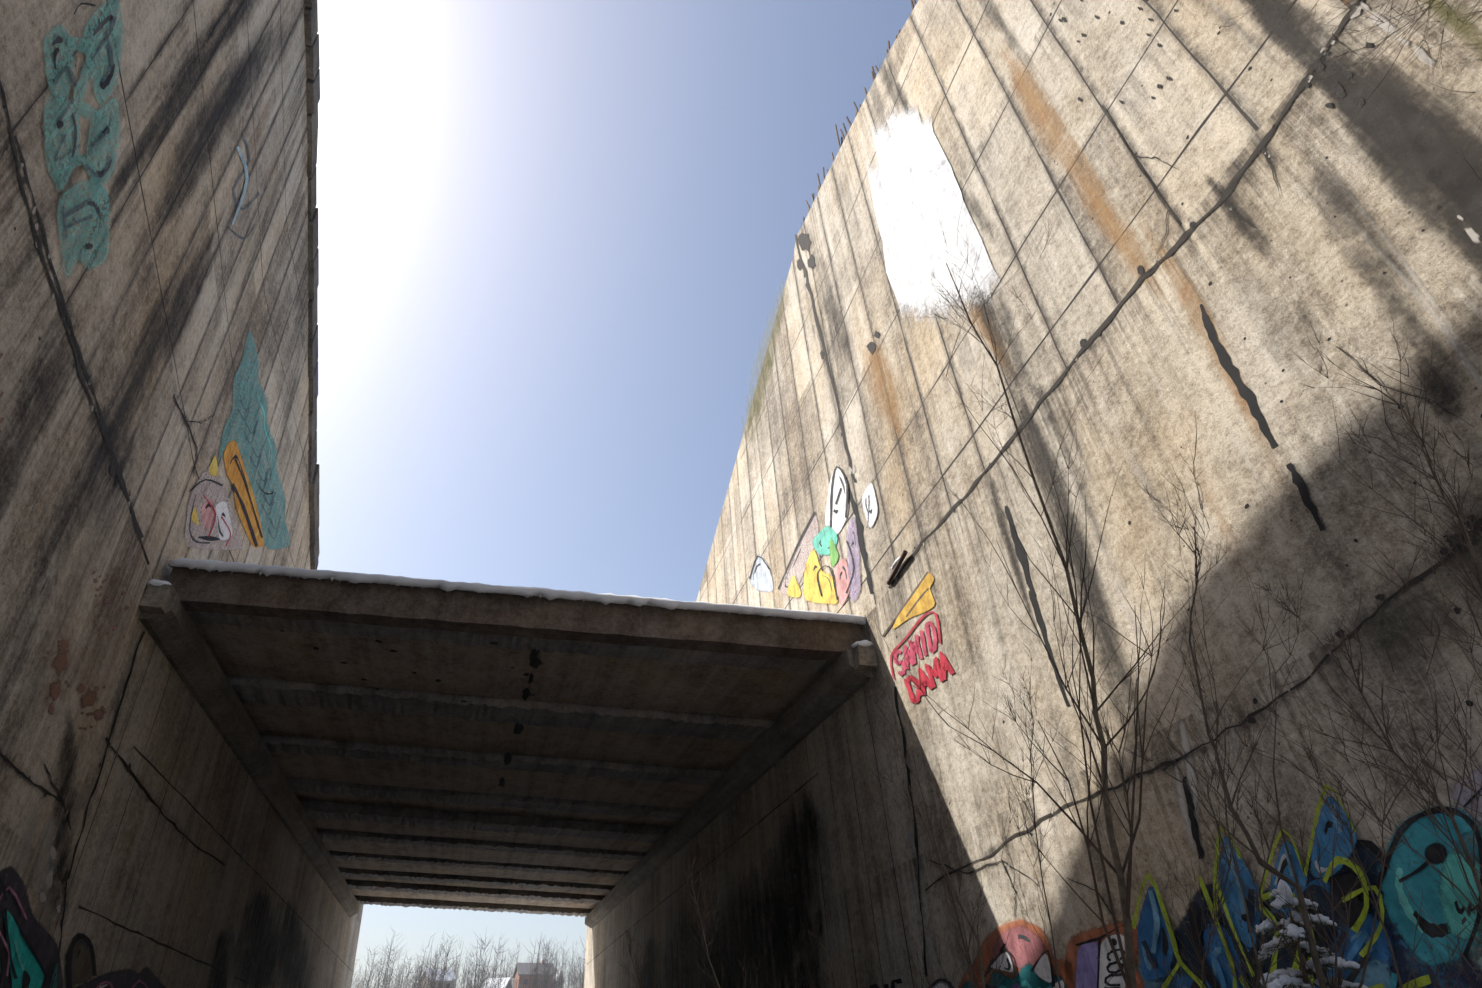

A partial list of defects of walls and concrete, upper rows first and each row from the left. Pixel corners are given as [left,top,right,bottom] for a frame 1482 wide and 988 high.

damp [0,346,65,518]
crack [0,80,150,565]
damp [52,219,221,551]
damp [96,0,273,225]
crack [795,234,856,483]
crack [888,0,1364,588]
damp [1208,179,1257,239]
damp [1240,0,1482,280]
damp [1316,178,1479,413]
damp [18,725,76,916]
damp [640,790,824,988]
crack [894,515,1482,977]